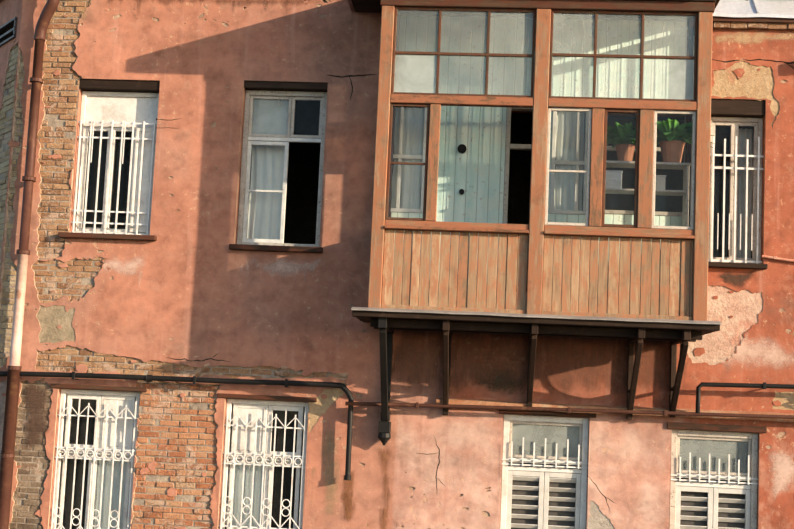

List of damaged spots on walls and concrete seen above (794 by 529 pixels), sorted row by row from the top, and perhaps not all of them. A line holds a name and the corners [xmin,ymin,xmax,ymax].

crack [328,75,368,101]
flaking render [711,60,788,128]
flaking render [0,41,27,368]
flaking render [9,0,363,529]
flaking render [687,285,764,365]
flaking render [772,391,794,410]
crack [416,437,445,489]